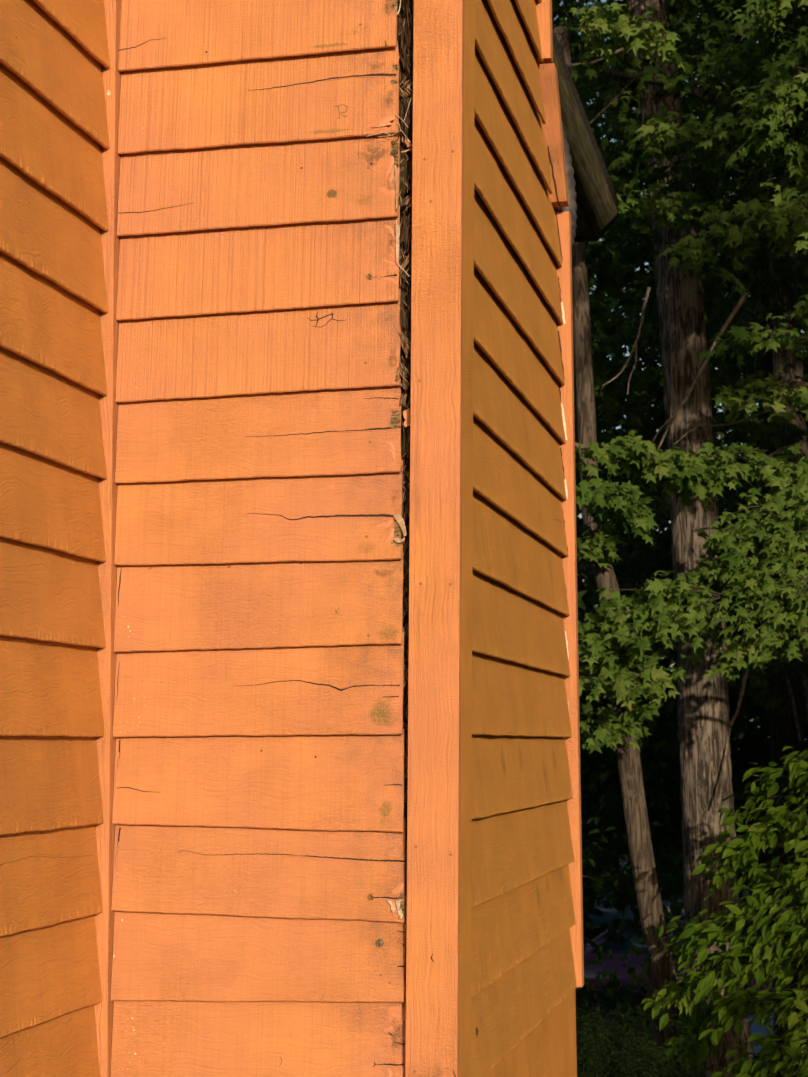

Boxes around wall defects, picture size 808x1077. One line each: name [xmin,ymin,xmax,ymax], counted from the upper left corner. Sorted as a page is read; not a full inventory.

crack [256,73,396,90]
crack [245,426,401,437]
crack [249,512,394,520]
crack [241,680,400,697]
crack [183,850,405,863]